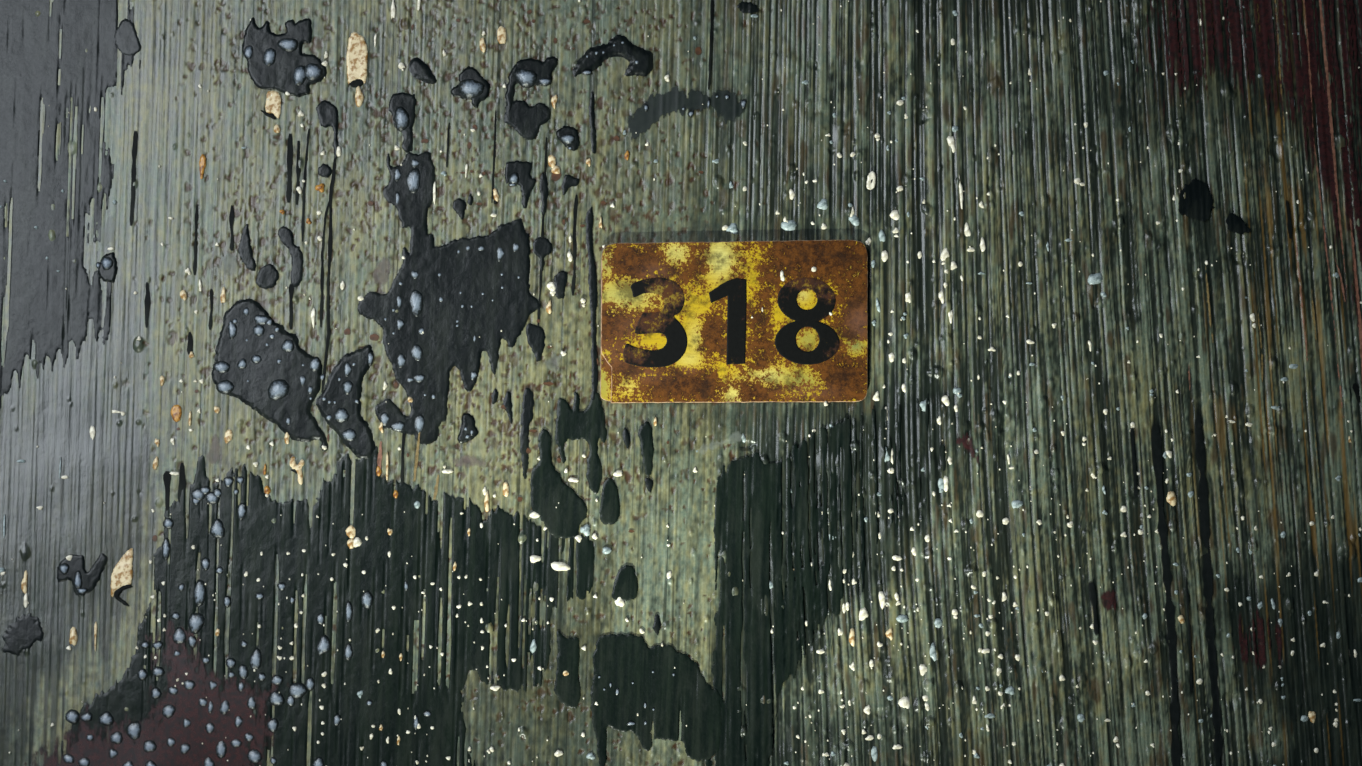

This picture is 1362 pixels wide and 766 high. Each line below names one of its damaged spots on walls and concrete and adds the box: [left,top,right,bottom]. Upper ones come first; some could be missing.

peeling [242,17,341,194]
peeling [346,32,377,107]
peeling [480,26,507,53]
peeling [572,34,746,160]
peeling [737,1,759,13]
peeling [54,56,958,766]